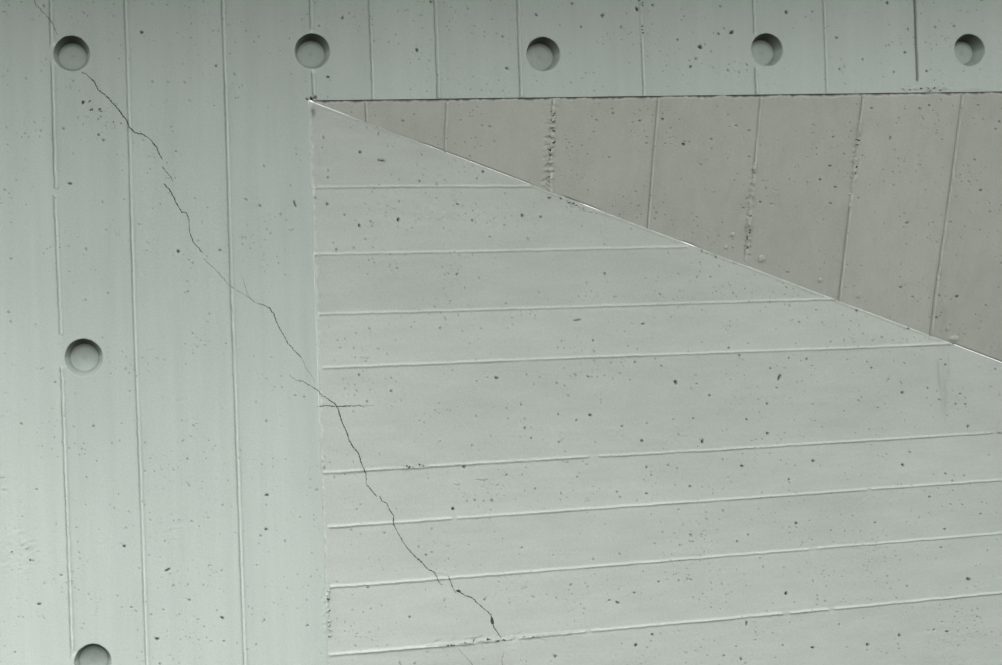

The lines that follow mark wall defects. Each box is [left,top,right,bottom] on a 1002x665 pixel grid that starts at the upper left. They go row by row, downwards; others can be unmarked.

crack [82,72,504,665]